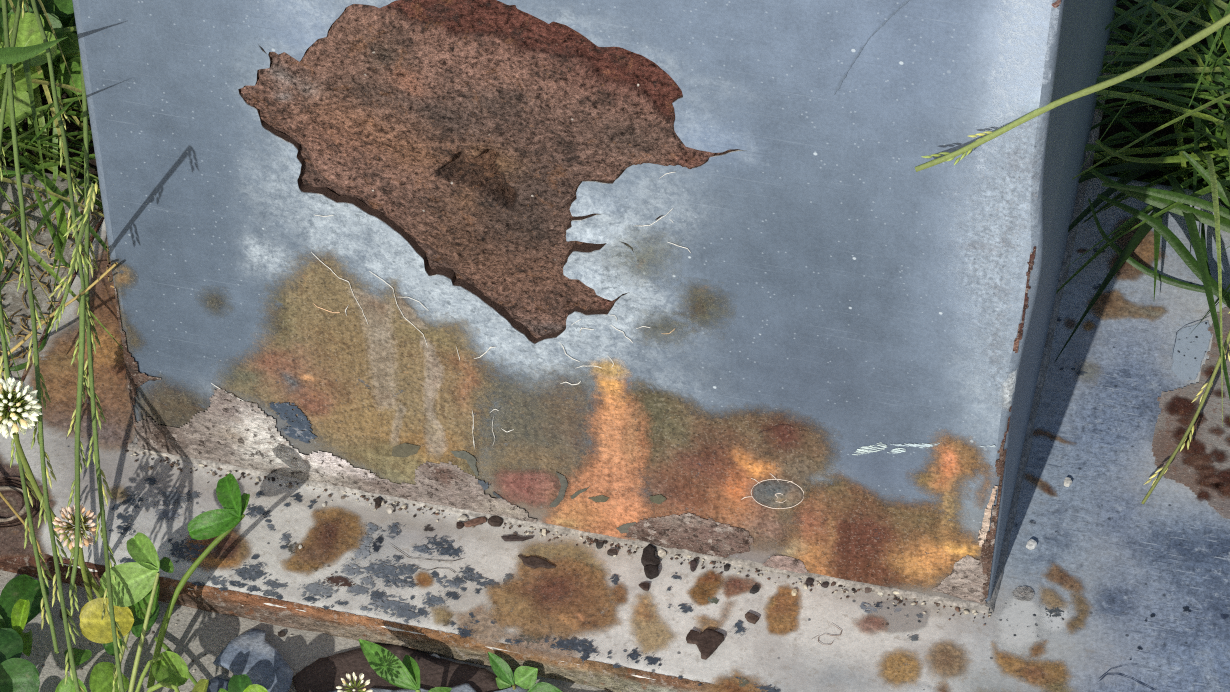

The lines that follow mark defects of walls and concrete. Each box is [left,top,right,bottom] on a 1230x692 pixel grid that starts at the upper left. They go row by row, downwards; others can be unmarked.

rust [1033,429,1072,444]
peeling [135,388,537,555]
rust [158,254,1007,692]
rust [1025,474,1056,496]
rust [0,460,106,589]
rust [1041,565,1089,632]
rust [995,642,1069,692]